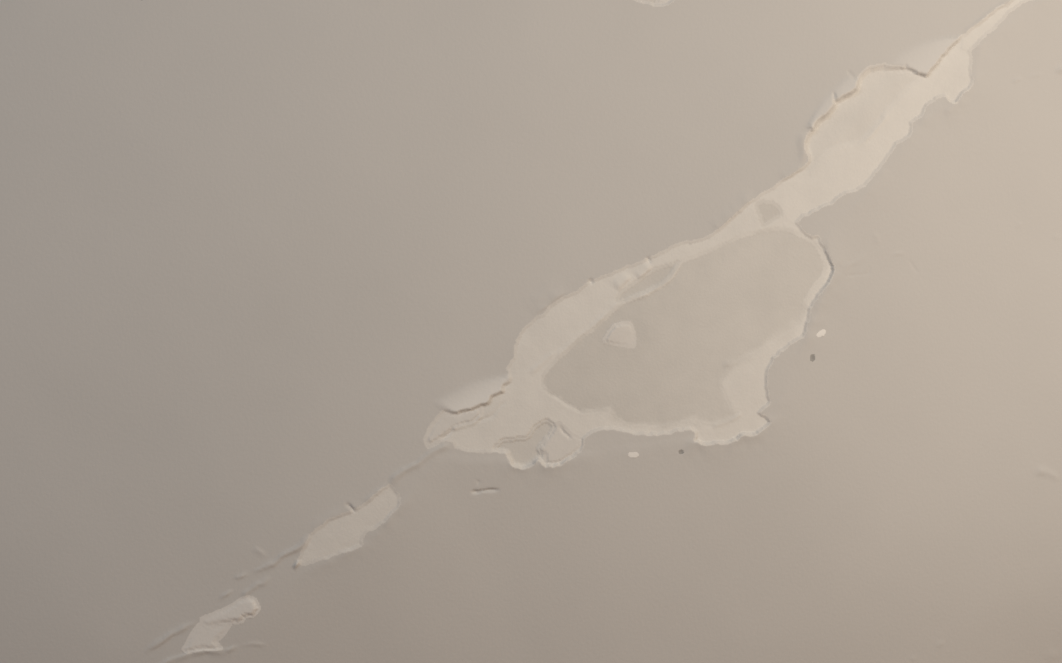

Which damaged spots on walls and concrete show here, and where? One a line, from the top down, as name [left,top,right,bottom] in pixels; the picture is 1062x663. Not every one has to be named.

peeling [409,24,988,486]
peeling [288,475,414,577]
peeling [181,595,261,654]